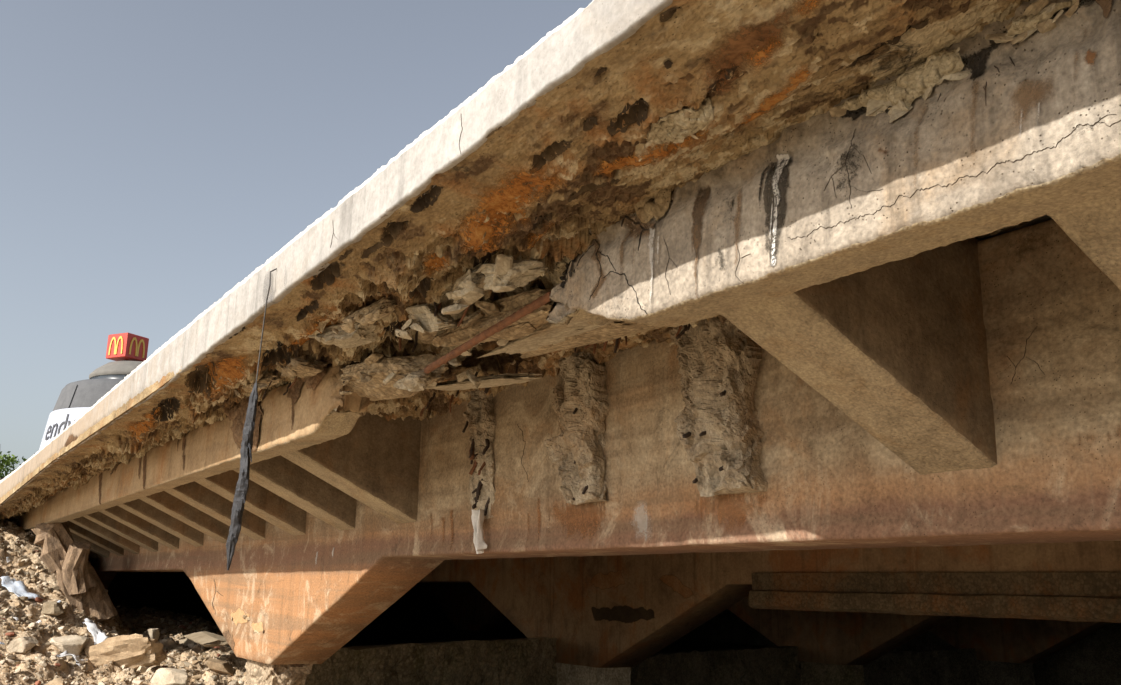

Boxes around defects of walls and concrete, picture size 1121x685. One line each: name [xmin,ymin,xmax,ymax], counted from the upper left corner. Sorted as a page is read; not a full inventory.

spalling [297,185,443,321]
corrosion [459,169,561,253]
crack [574,189,677,314]
corrosion [598,131,708,175]
spalling [583,67,736,148]
damp [691,186,710,281]
damp [758,154,793,267]
corrosion [741,68,812,124]
damp [834,141,863,197]
peeling [829,47,971,123]
crack [788,114,1121,240]
spalling [224,248,690,452]